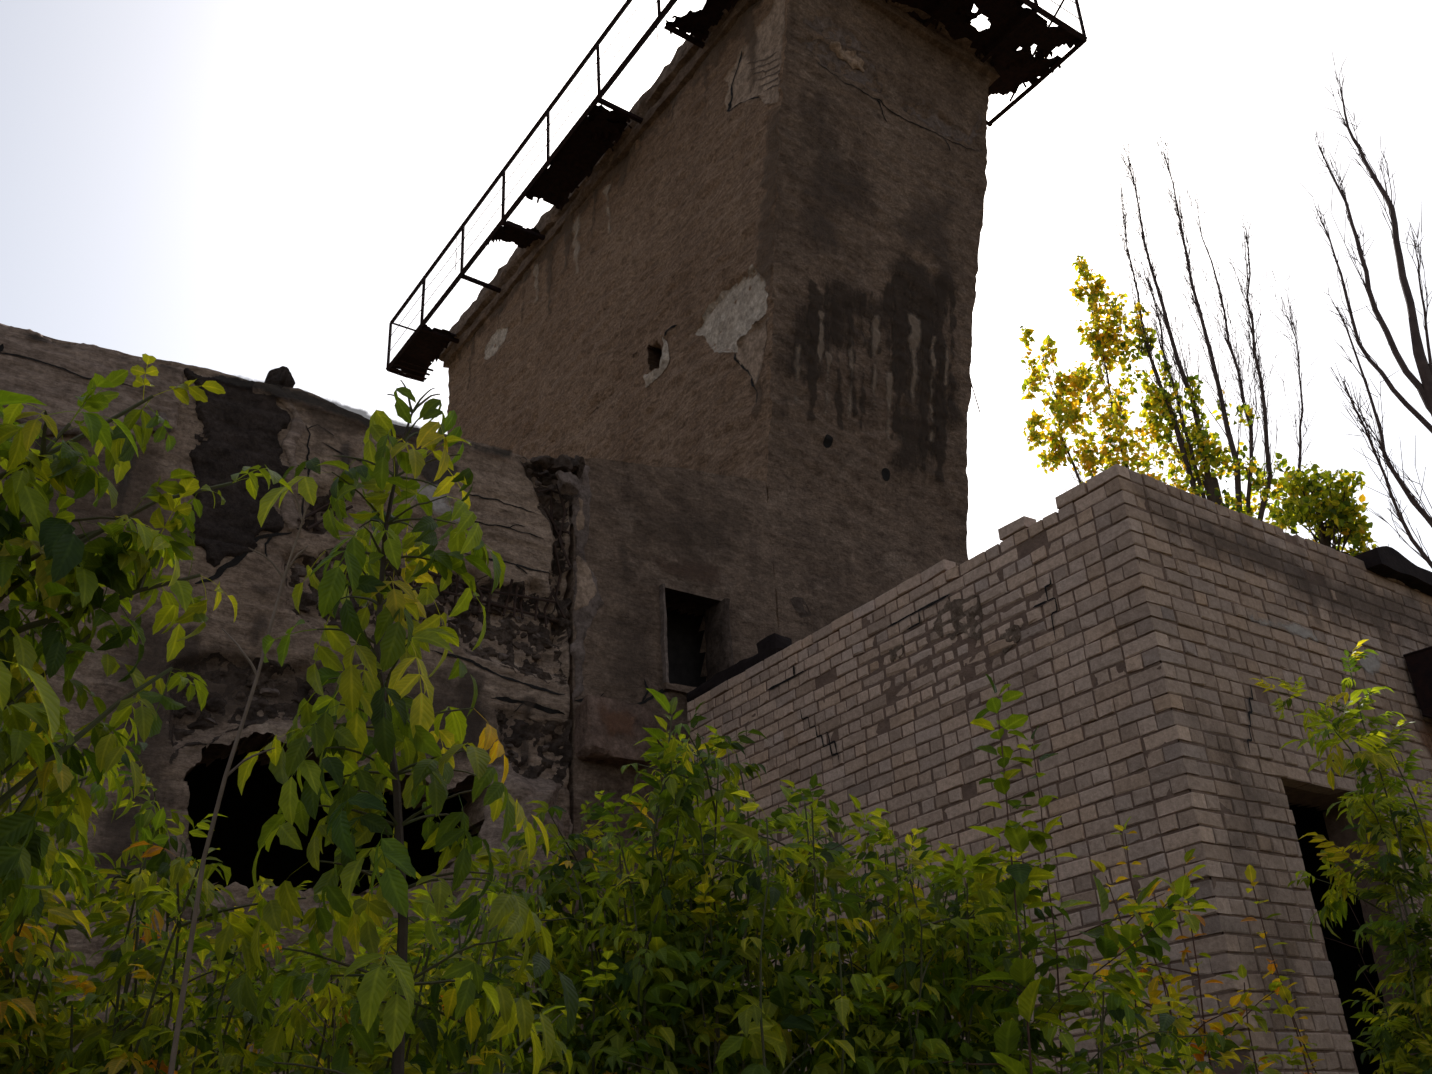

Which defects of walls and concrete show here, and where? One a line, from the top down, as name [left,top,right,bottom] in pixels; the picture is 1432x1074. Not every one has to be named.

spalling [643,332,670,388]
flaking render [696,264,769,384]
water stain [786,257,961,482]
peeling [0,323,604,702]
spalling [166,652,326,764]
spalling [495,709,572,788]